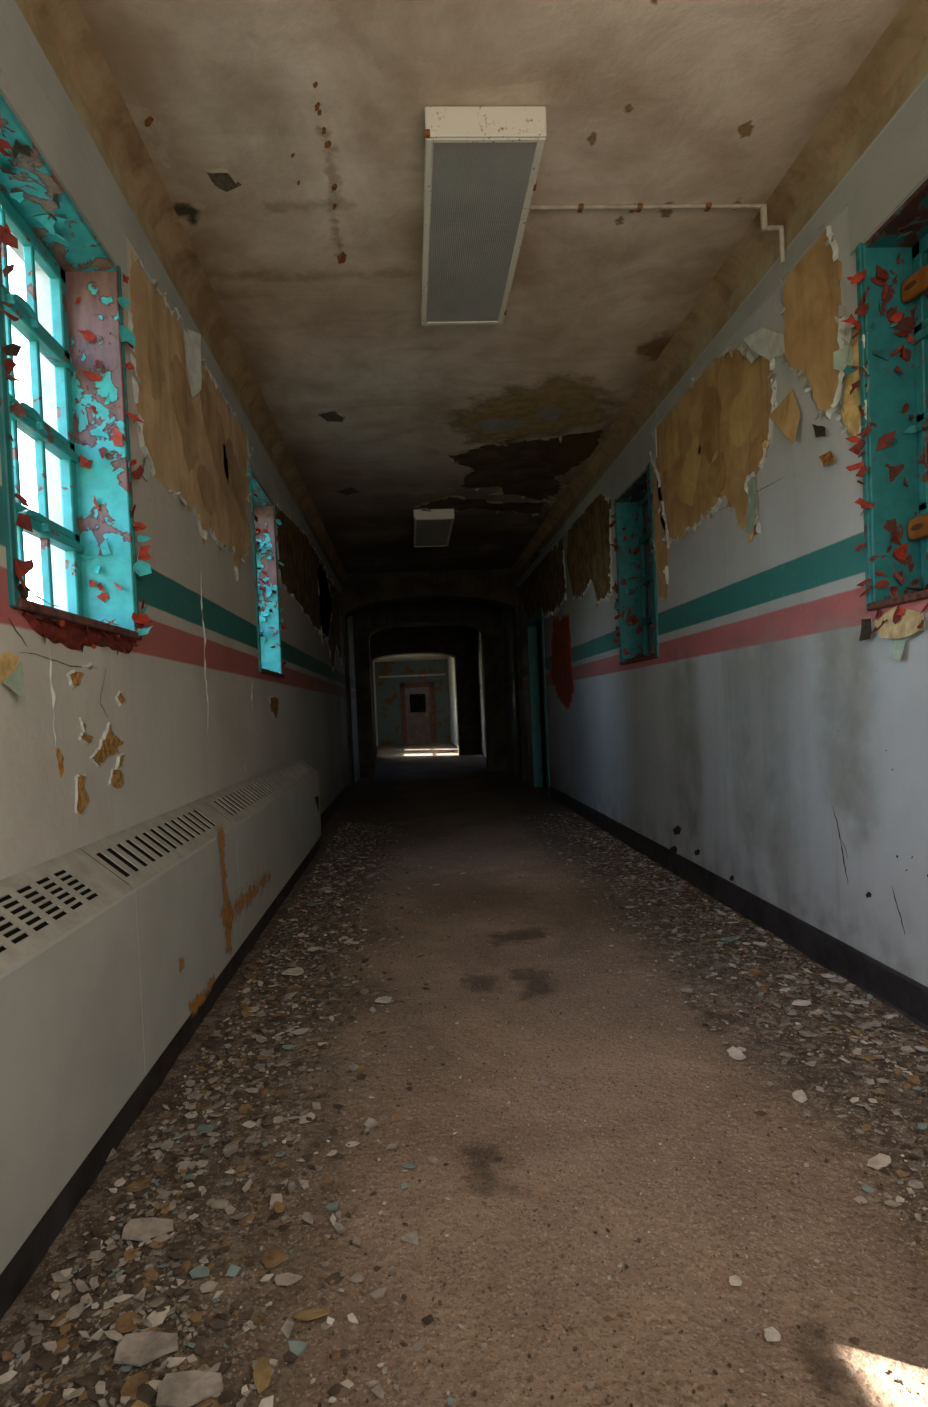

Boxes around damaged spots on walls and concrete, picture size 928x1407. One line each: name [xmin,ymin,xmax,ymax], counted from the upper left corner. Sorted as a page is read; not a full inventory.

peeling [0,116,31,208]
peeling [33,194,69,257]
peeling [75,248,333,673]
flaking render [318,411,345,422]
peeling [415,429,605,517]
peeling [518,223,916,709]
peeling [15,539,148,689]
peeling [859,531,928,661]
peeling [56,717,125,818]
rust [217,826,271,955]